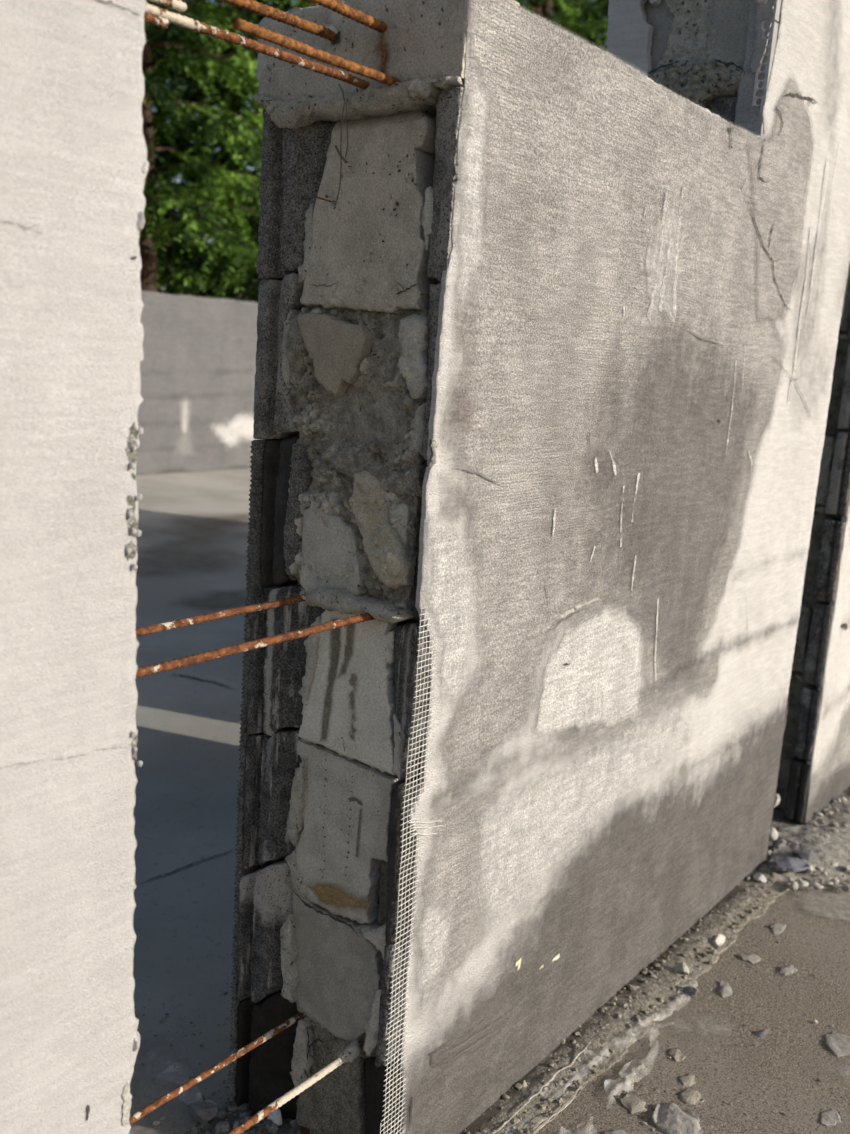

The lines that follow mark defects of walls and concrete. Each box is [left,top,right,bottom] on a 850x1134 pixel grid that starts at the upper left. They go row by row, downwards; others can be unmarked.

crack [97,0,141,17]
crack [742,92,818,311]
peeling [297,313,374,396]
spalling [427,440,438,467]
water stain [404,0,828,1134]
spalling [136,613,376,678]